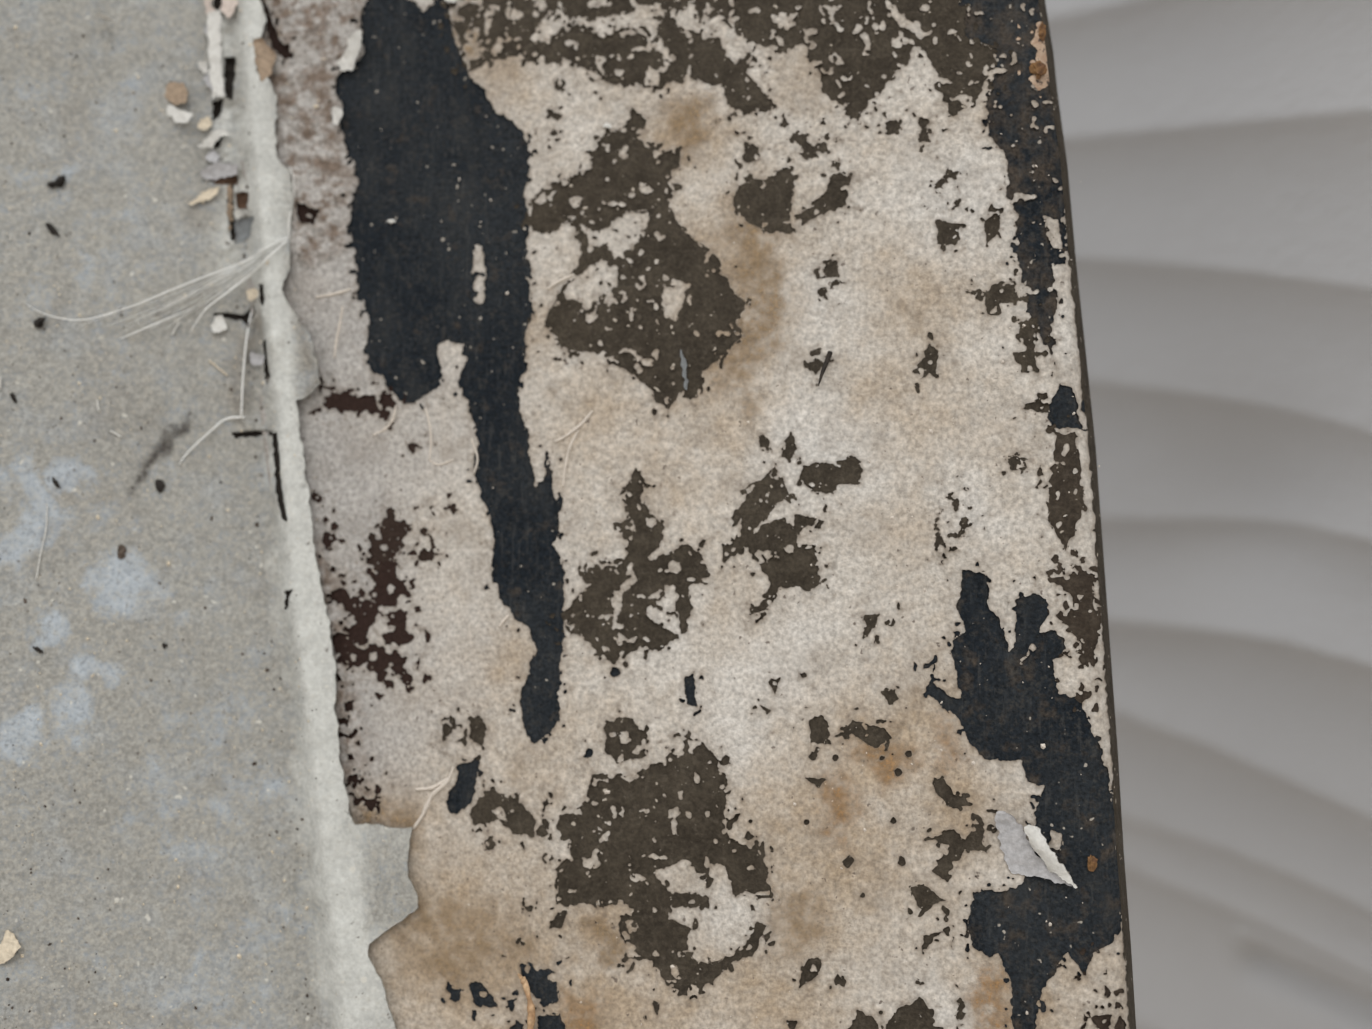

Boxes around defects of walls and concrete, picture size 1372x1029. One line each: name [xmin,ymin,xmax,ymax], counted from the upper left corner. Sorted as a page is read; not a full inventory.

peeling [198,0,238,98]
spalling [253,38,276,81]
spalling [297,201,320,225]
peeling [211,315,227,332]
peeling [309,0,1068,744]
peeling [311,490,458,819]
peeling [809,686,912,777]
peeling [908,385,1130,1029]
peeling [806,777,826,788]
peeling [441,674,776,1029]
peeling [792,957,846,989]
peeling [848,979,966,1029]